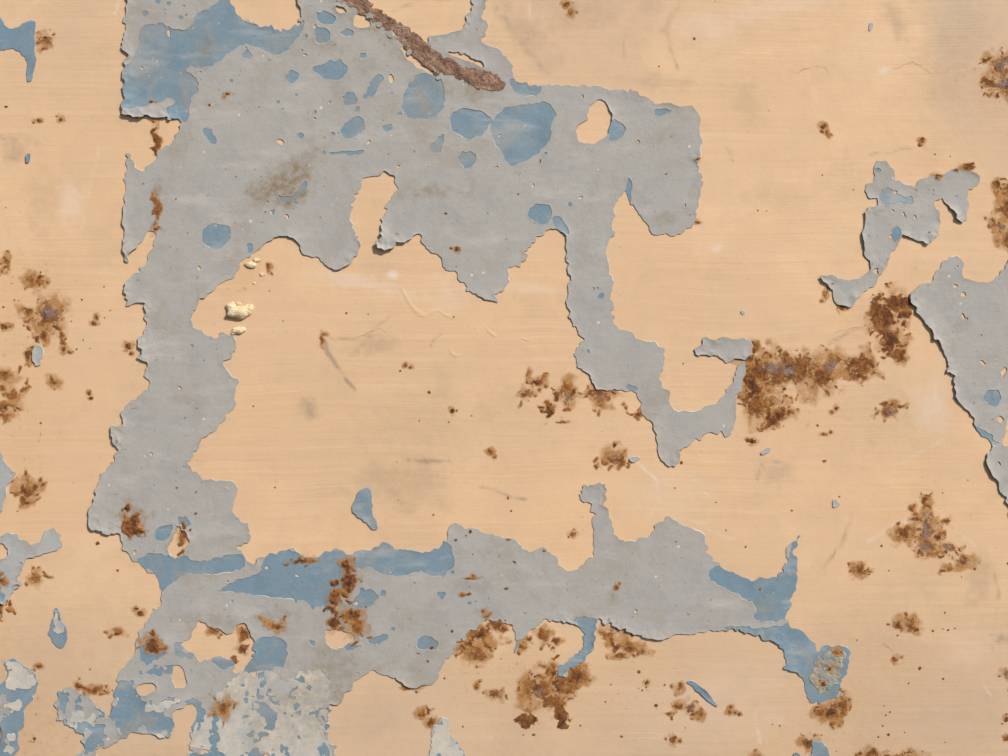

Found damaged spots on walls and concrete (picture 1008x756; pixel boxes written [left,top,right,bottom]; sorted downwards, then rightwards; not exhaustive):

peeling [0,17,36,82]
corrosion [336,0,506,91]
peeling [820,160,980,308]
corrosion [0,271,91,423]
peeling [54,0,851,756]
corrosion [518,368,643,423]
corrosion [736,282,912,444]
peeling [910,255,1008,504]
peeling [0,528,63,605]
corrosion [880,492,980,578]
peeling [0,658,39,756]
corrosion [451,609,592,736]